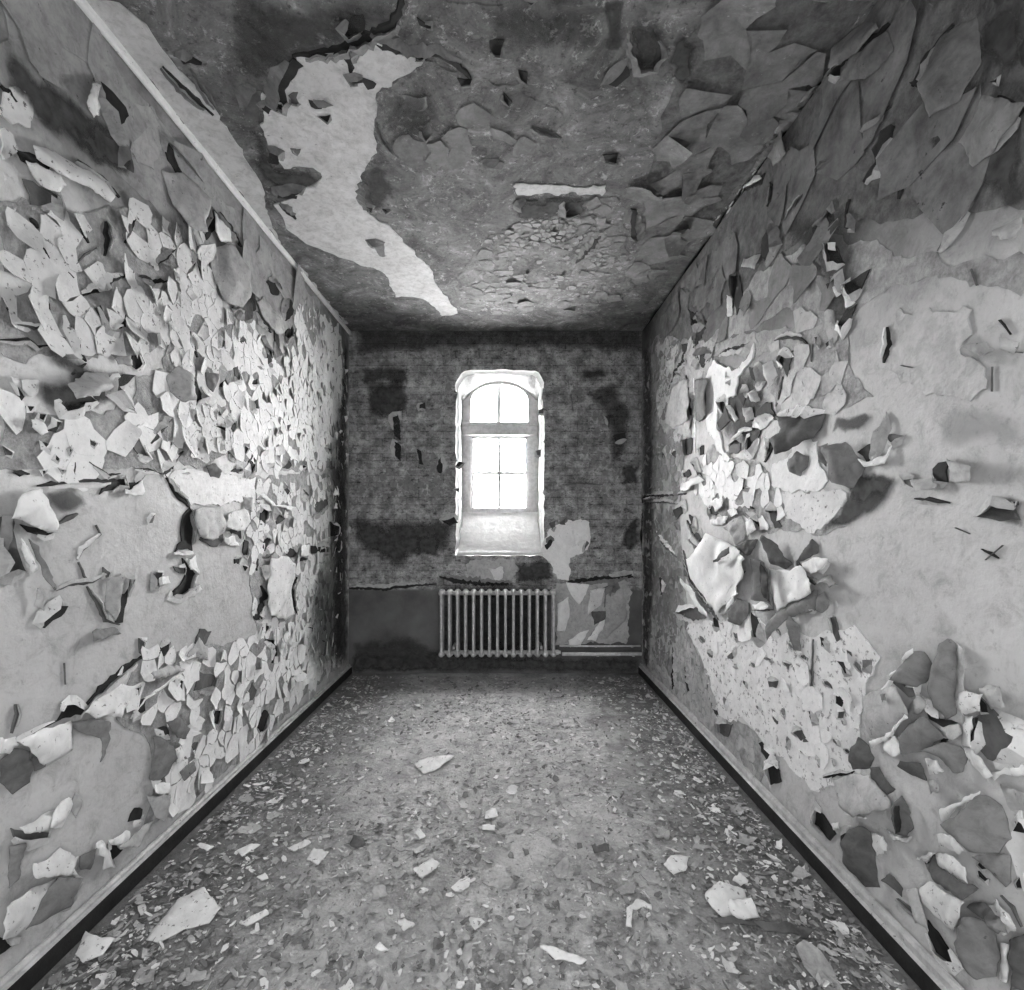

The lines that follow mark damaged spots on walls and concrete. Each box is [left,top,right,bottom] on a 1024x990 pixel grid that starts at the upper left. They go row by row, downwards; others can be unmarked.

peeling [0,0,465,954]
damp [312,348,638,672]
peeling [235,0,1024,990]